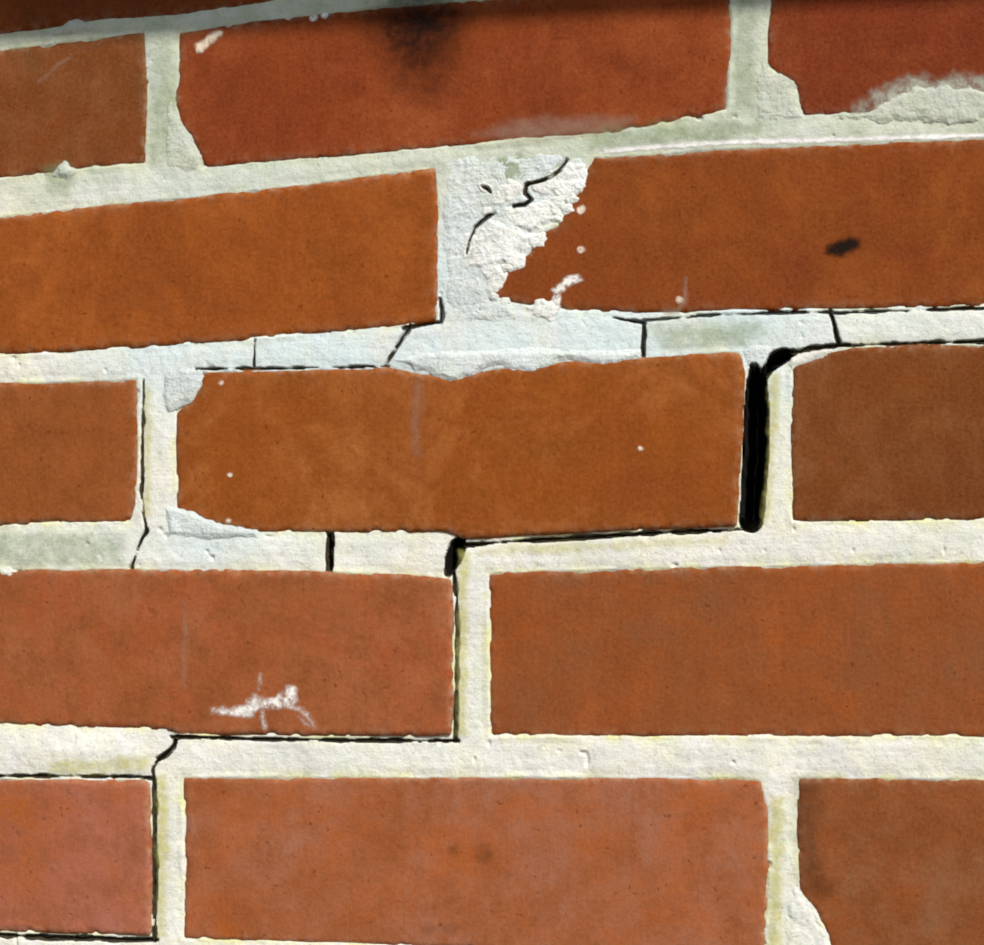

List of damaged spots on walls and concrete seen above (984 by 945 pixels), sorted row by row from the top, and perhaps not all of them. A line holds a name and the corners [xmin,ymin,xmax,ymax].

spalling [442,154,588,322]
crack [466,160,567,254]
crack [0,299,984,943]